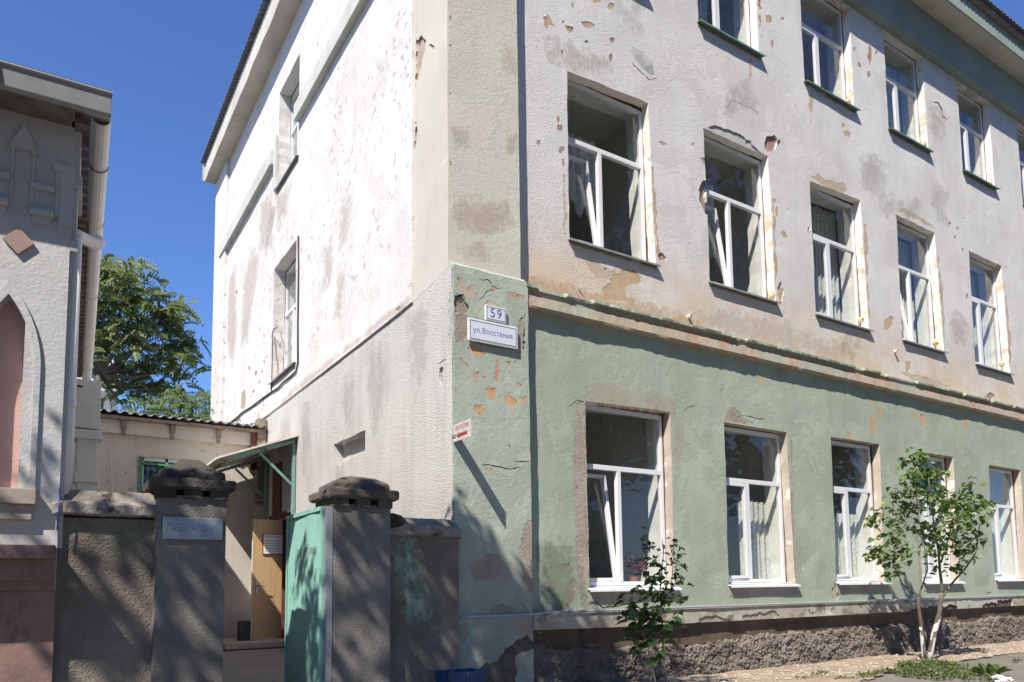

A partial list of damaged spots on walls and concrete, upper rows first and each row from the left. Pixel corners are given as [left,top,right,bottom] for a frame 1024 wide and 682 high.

peeling [543,14,595,43]
spalling [709,126,781,152]
peeling [812,174,847,193]
peeling [586,261,641,301]
peeling [452,276,527,414]
peeling [725,407,753,424]
crack [483,444,528,469]
peeling [468,401,589,682]